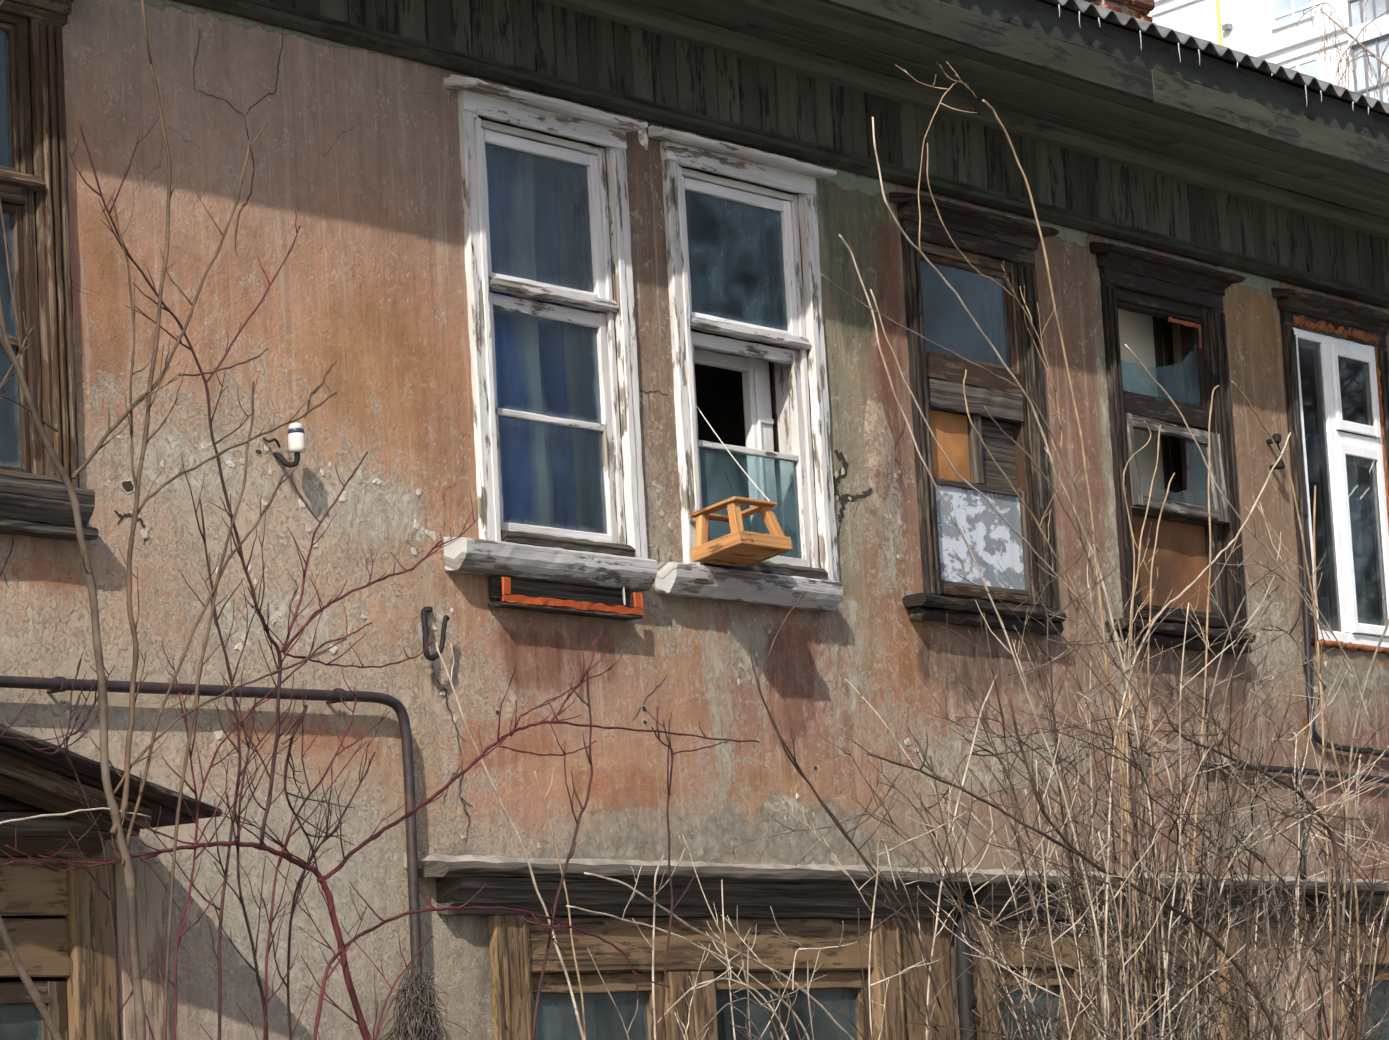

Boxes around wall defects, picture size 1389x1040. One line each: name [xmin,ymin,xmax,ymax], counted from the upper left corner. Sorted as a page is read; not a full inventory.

spalling [638,129,648,150]
peeling [116,425,278,506]
peeling [299,458,436,555]
peeling [644,481,673,562]
crack [833,420,905,536]
peeling [880,464,903,590]
peeling [65,708,224,740]
peeling [204,563,366,656]
peeling [417,608,454,659]
leakage [702,620,733,803]
leakage [831,600,863,755]